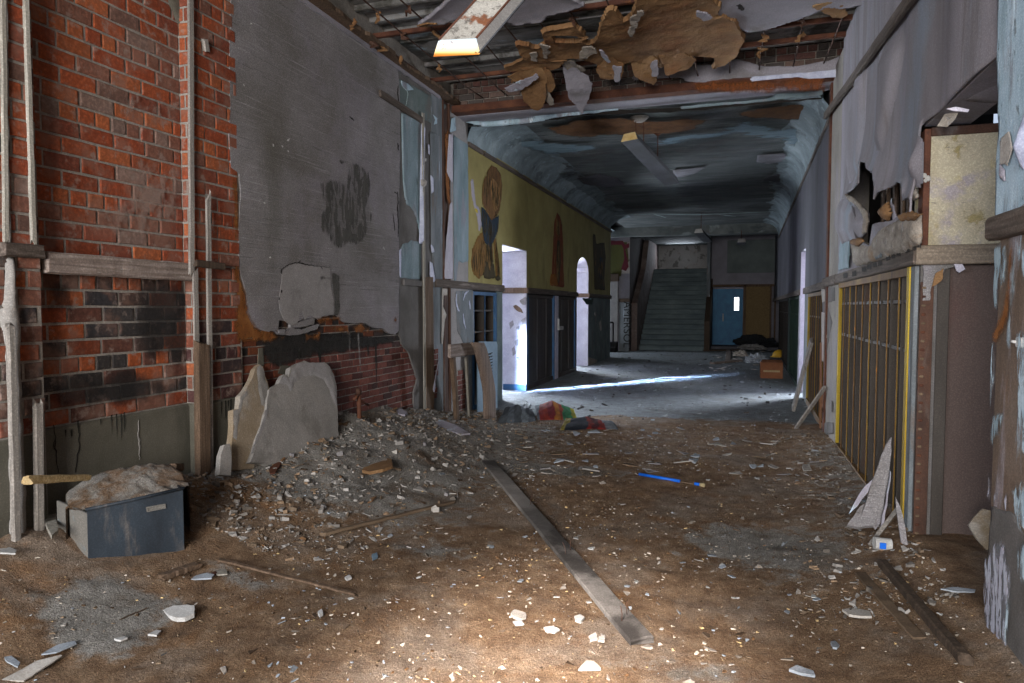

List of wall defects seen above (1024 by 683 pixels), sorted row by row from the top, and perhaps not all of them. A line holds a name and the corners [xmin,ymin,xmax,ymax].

peeling [969,0,1024,222]
water stain [322,160,372,247]
spalling [399,0,863,398]
spalling [838,173,931,271]
peeling [993,247,1005,306]
spalling [273,318,319,335]
peeling [991,415,1001,445]
spalling [941,483,1024,666]